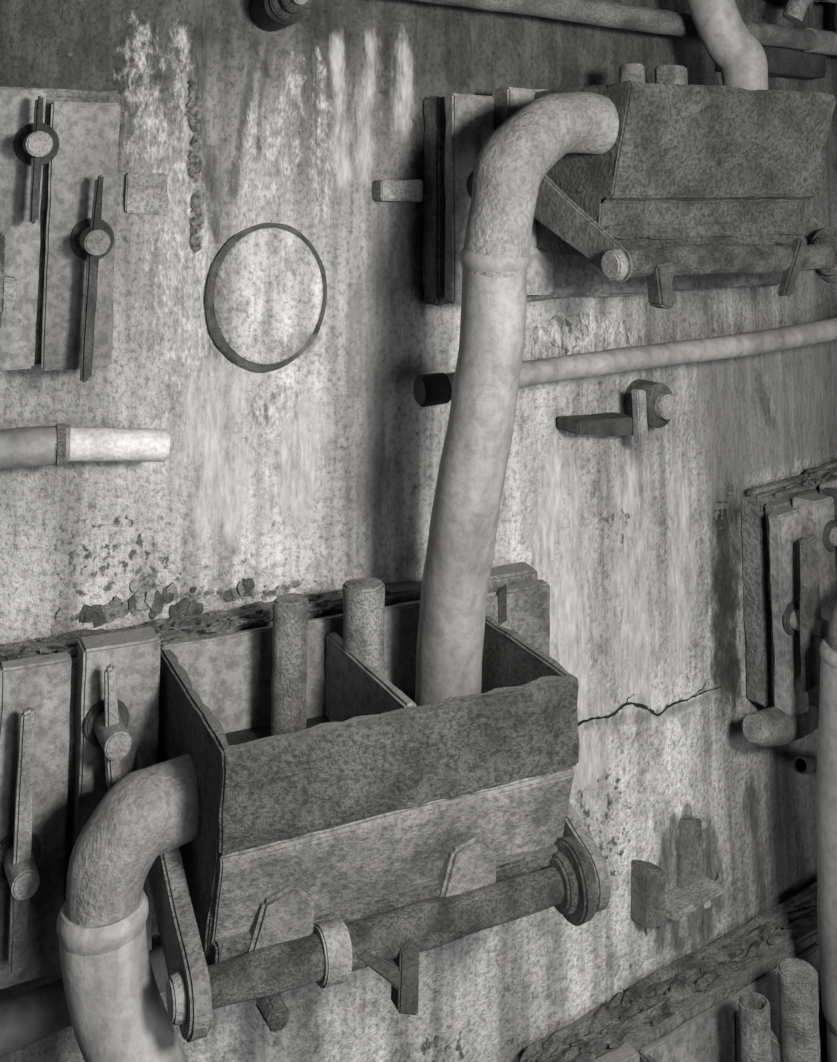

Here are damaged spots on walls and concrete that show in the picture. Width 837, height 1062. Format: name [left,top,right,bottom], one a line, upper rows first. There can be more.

efflorescence [233,34,375,234]
damp [395,18,426,309]
spalling [56,570,327,628]
crack [578,680,722,726]